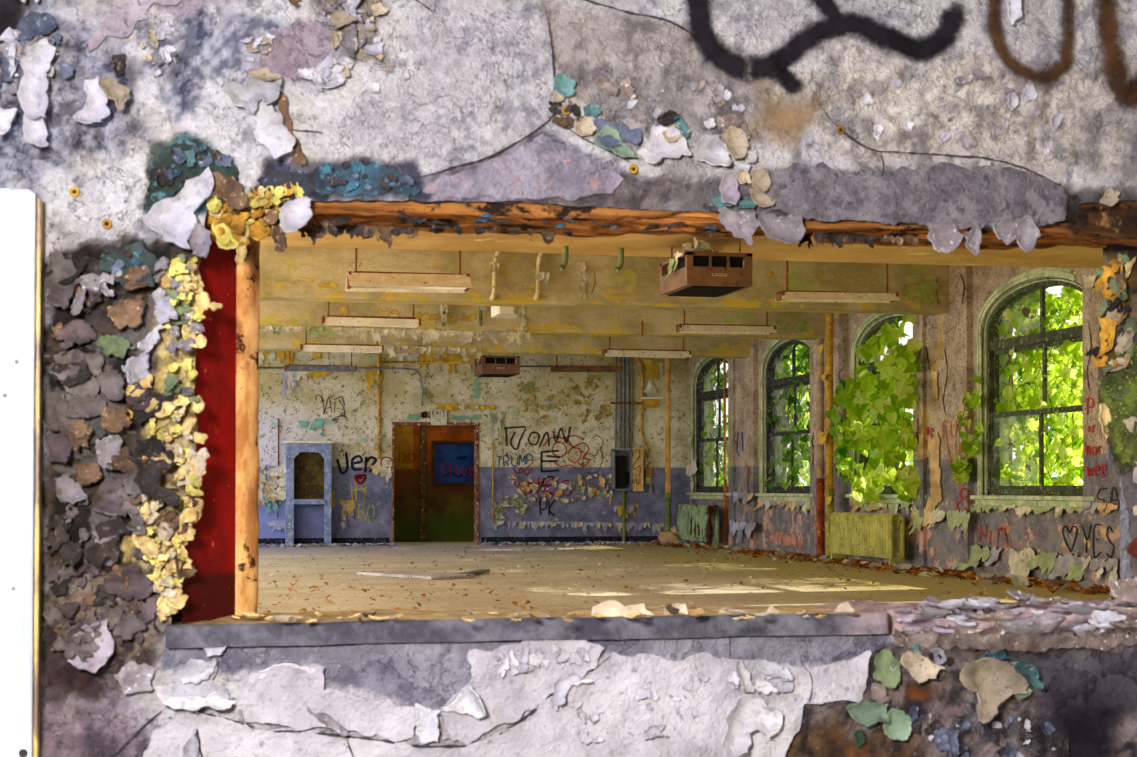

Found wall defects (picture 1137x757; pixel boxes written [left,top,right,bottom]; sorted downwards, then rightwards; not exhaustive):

peeling [0,0,130,147]
peeling [88,0,182,77]
peeling [297,0,389,91]
crack [418,0,629,178]
crack [585,0,693,35]
peeling [548,73,1041,256]
peeling [42,33,622,673]
peeling [1082,253,1137,375]
peeling [1098,403,1114,469]
peeling [113,432,1137,757]
crack [195,708,538,757]
water stain [1048,700,1117,757]